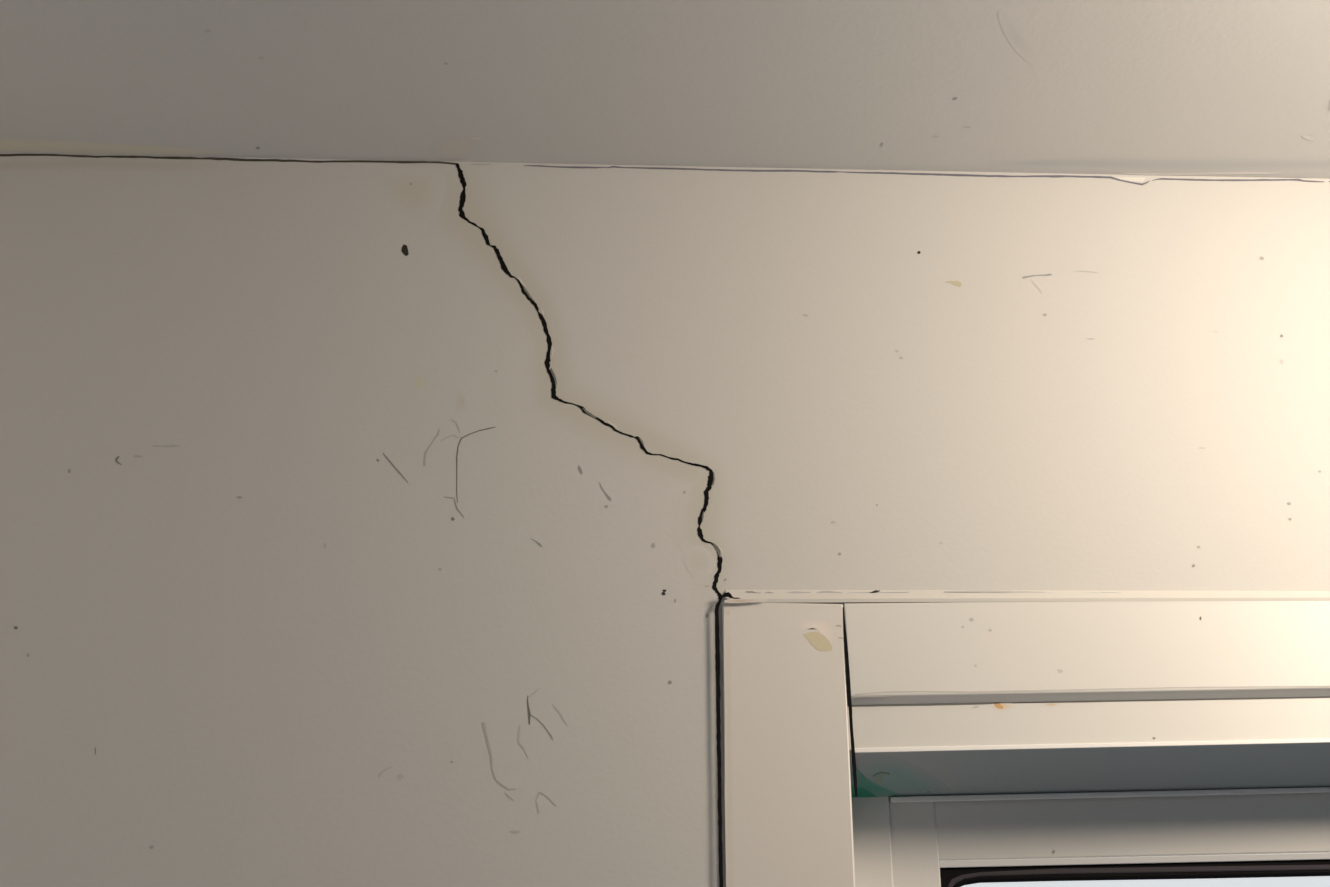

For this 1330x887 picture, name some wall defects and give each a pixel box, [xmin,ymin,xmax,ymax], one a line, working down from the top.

crack [0,154,740,599]
crack [524,165,1330,185]